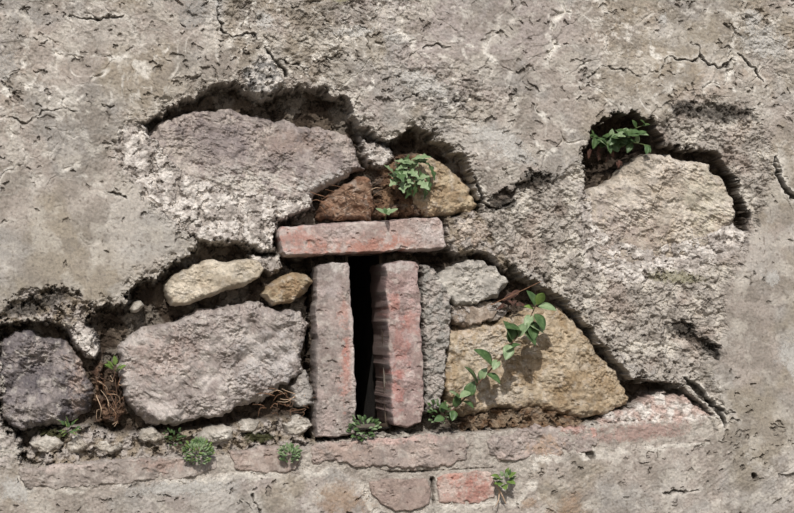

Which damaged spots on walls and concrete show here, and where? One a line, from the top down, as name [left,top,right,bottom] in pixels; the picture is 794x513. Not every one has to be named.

crack [587,42,765,83]
crack [773,154,794,201]
flaking render [0,80,587,513]
flaking render [354,93,780,456]
spalling [662,489,700,497]